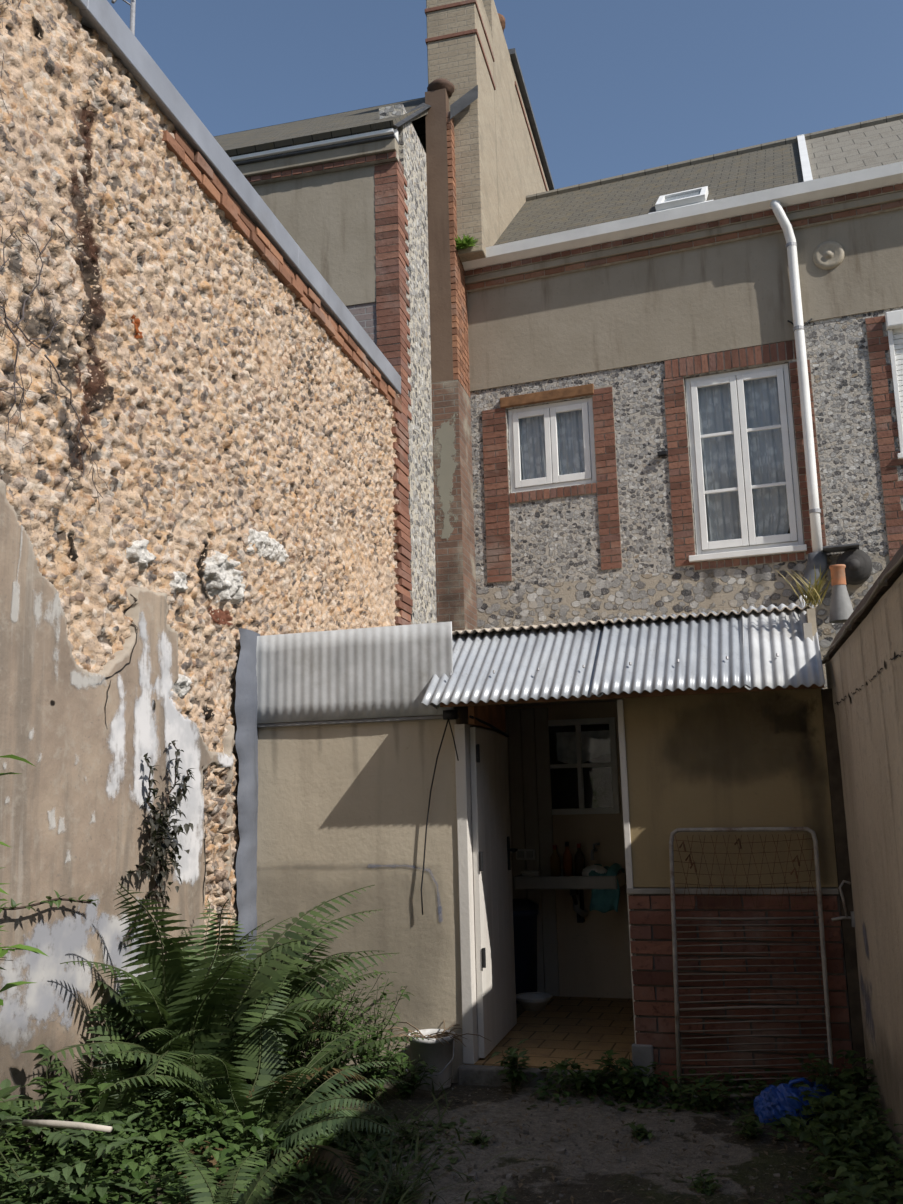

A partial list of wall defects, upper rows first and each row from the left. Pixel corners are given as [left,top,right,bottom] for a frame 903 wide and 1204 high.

spalling [67,530,78,562]
peeling [48,810,64,833]
peeling [106,614,235,940]
peeling [0,895,151,1054]